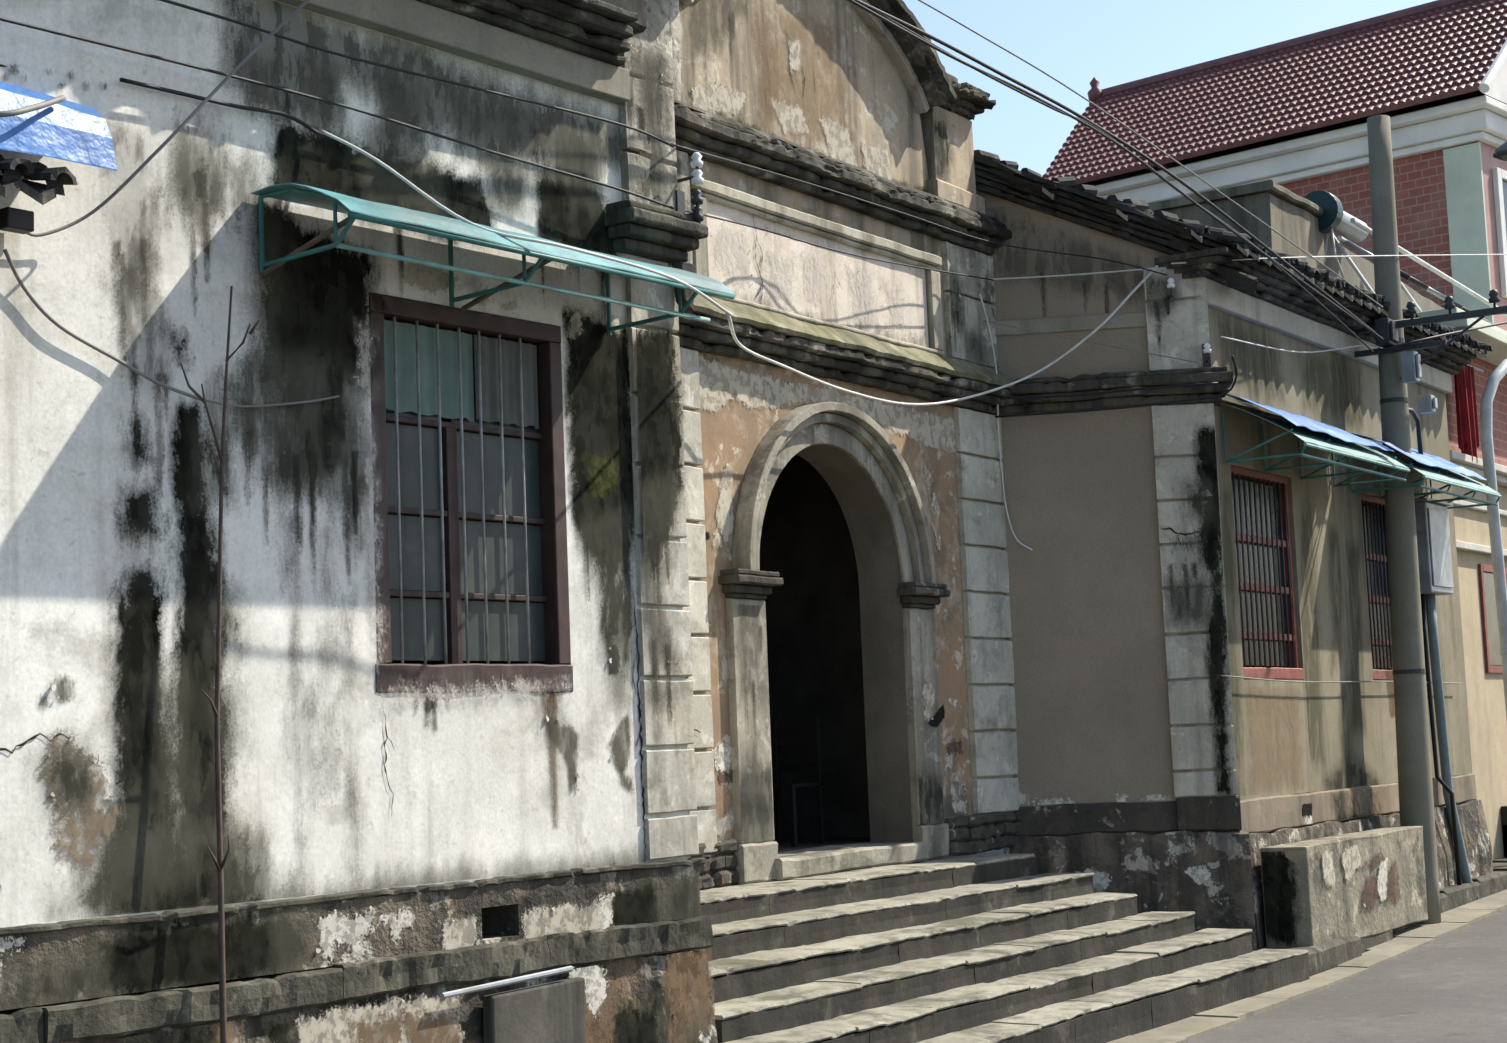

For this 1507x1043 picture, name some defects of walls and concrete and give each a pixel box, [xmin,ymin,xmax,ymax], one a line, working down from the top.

peeling [698,355,956,453]
leakage [17,62,622,1006]
leakage [562,272,683,692]
peeling [712,463,734,549]
leakage [1167,427,1232,795]
crack [0,733,99,767]
crack [383,712,395,816]
peeling [310,906,417,963]
peeling [521,892,615,938]
leakage [612,874,701,926]
spalling [1322,844,1401,912]
peeling [295,993,465,1043]